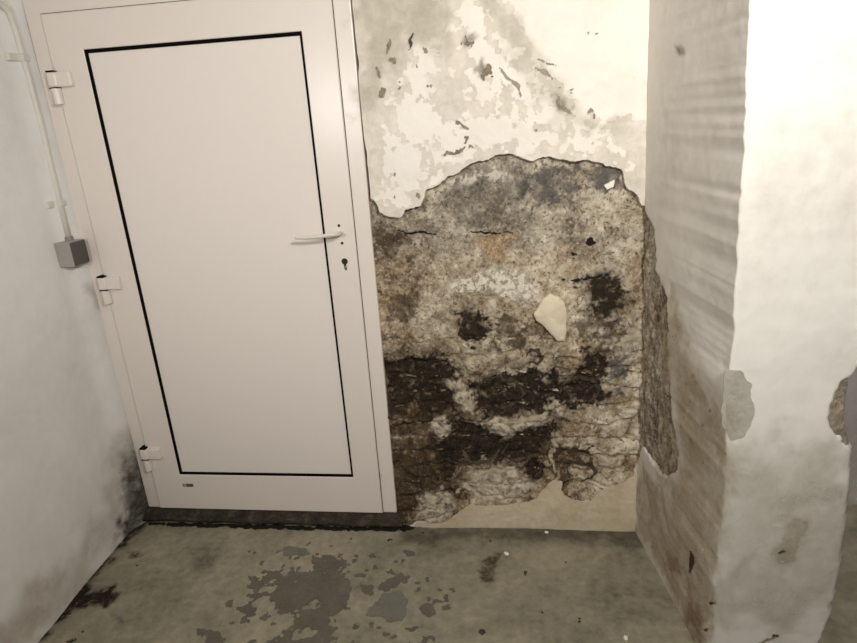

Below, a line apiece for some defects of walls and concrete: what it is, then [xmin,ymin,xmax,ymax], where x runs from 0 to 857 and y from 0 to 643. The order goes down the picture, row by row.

leakage [447,165,512,188]
leakage [517,159,622,210]
spalling [369,0,682,533]
peeling [721,369,755,440]
spalling [828,378,849,445]
leakage [638,367,728,638]
leakage [55,457,149,623]